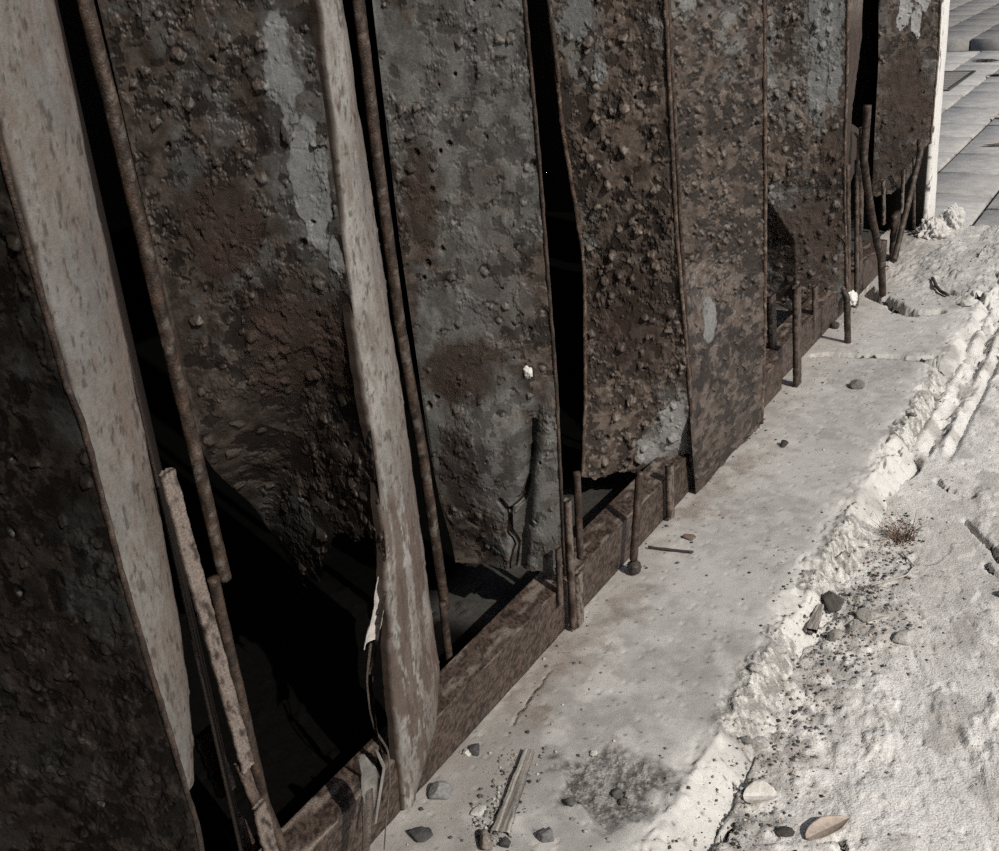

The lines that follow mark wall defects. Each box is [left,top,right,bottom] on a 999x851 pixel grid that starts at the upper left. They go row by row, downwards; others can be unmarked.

corrosion [876,49,934,187]
corrosion [770,132,845,293]